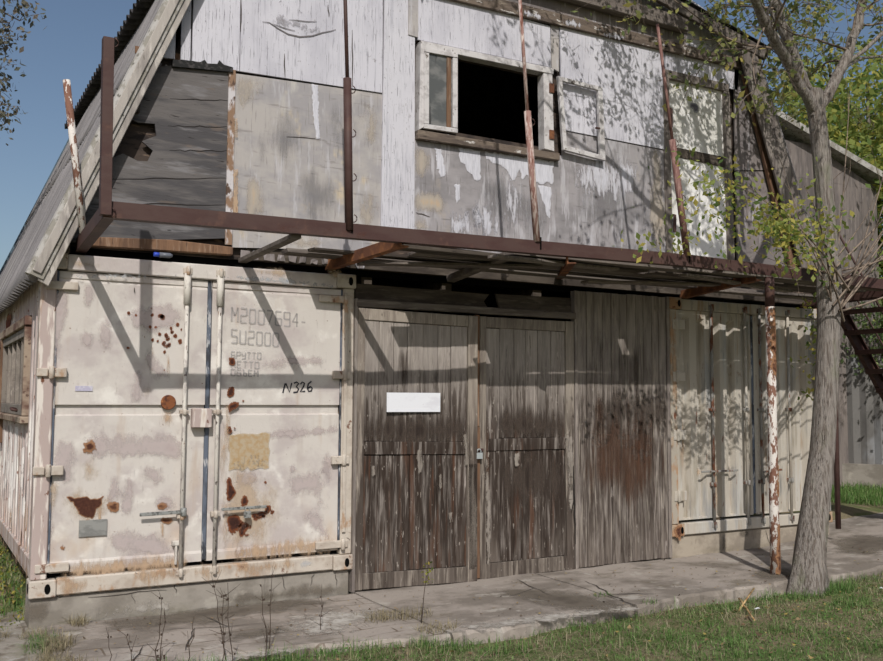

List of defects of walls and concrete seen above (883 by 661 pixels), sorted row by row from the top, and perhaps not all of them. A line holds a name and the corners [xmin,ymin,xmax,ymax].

peeling [434,147,446,177]
peeling [458,148,554,218]
corrosion [149,308,182,371]
corrosion [227,387,244,412]
water stain [364,412,464,442]
water stain [501,408,561,438]
water stain [586,355,665,501]
peeling [3,403,34,518]
corrosion [83,439,96,454]
corrosion [223,424,274,537]
corrosion [67,495,119,520]
corrosion [157,503,172,535]